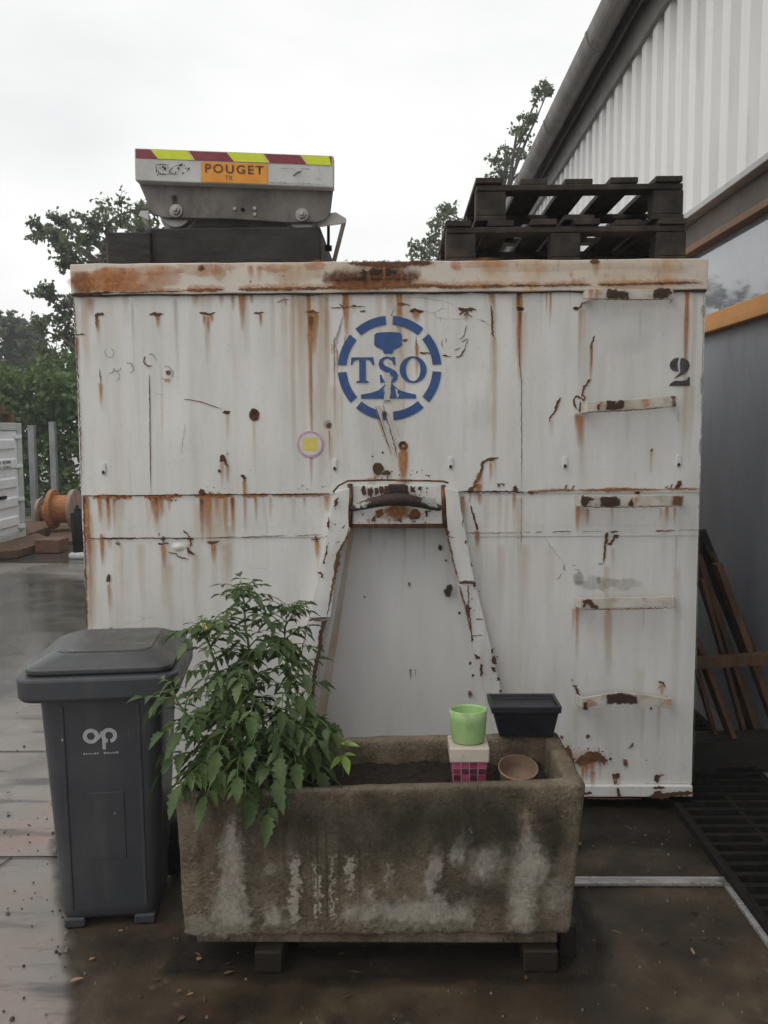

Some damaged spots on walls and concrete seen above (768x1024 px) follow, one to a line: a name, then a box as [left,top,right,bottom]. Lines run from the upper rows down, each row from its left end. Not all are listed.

rust [71,259,707,637]
rust [302,528,349,697]
rust [584,772,694,800]